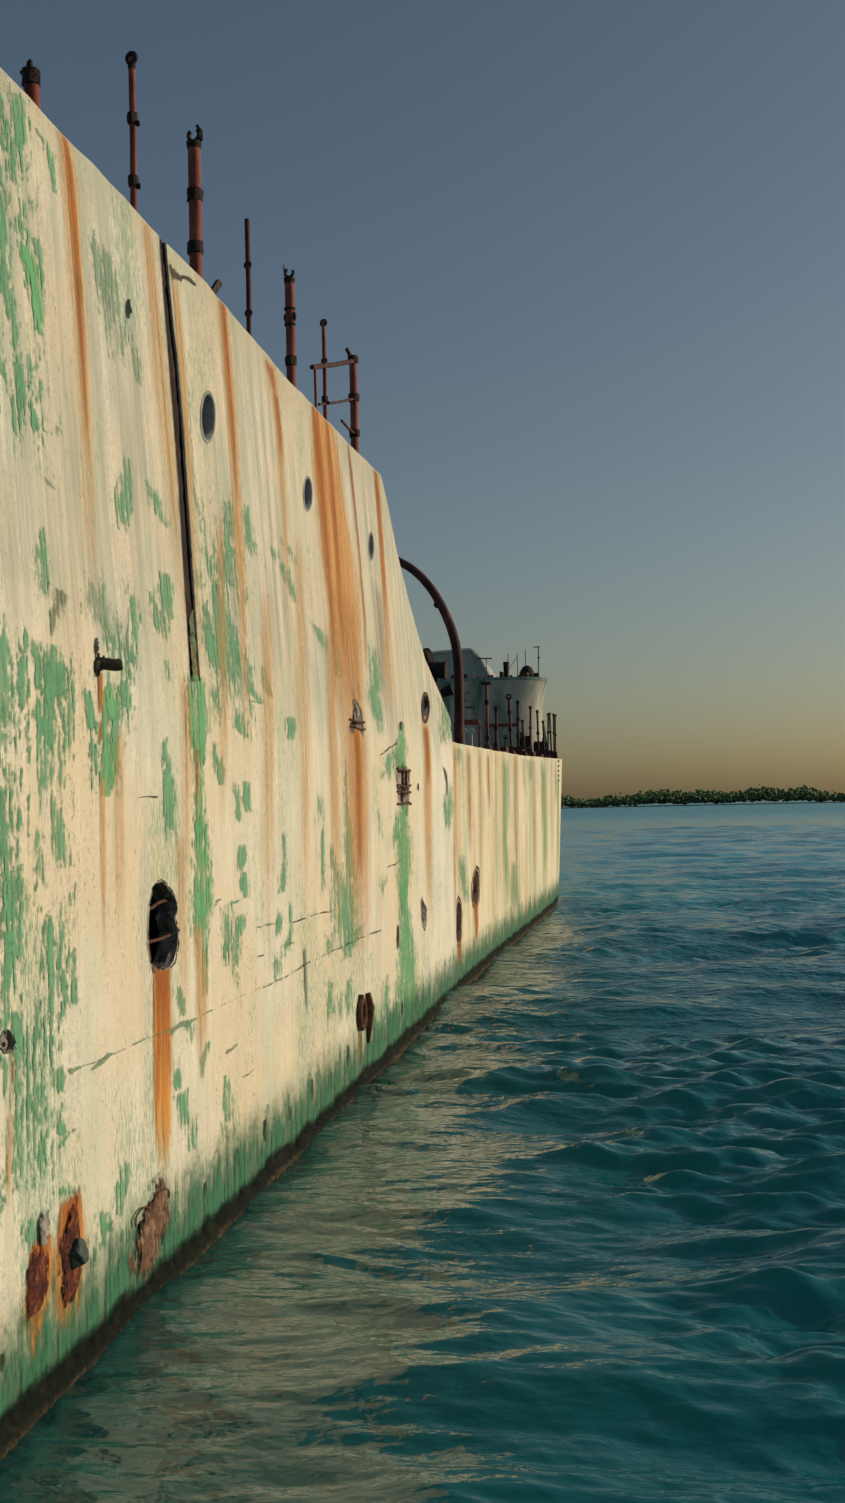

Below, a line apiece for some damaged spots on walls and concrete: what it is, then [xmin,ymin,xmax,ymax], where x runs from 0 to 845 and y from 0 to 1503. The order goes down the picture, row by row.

peeling [0,71,70,492]
rust [60,132,92,477]
rust [312,405,368,876]
rust [374,470,391,682]
peeling [146,482,298,1075]
peeling [0,527,175,1251]
rust [180,848,207,1047]
rust [154,966,174,1160]
peeling [173,1068,198,1152]
peeling [219,1075,235,1146]
rust [24,1191,83,1359]